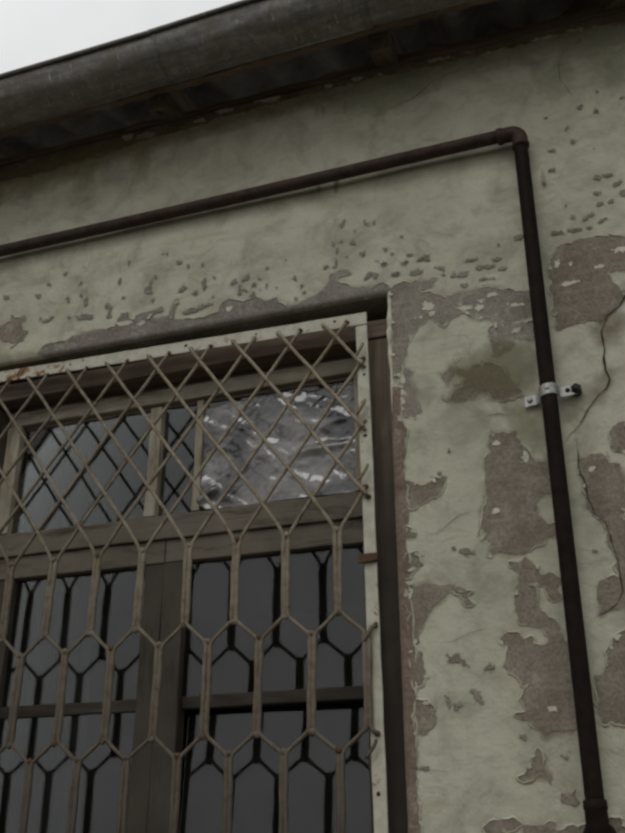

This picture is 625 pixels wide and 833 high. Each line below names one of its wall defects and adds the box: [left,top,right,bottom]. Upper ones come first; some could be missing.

peeling [547,173,625,330]
peeling [37,219,534,833]
peeling [476,430,577,740]
crack [565,295,625,618]
peeling [577,421,625,615]
peeling [593,628,625,728]
peeling [481,815,586,833]
peeling [515,746,553,785]
peeling [608,815,625,833]